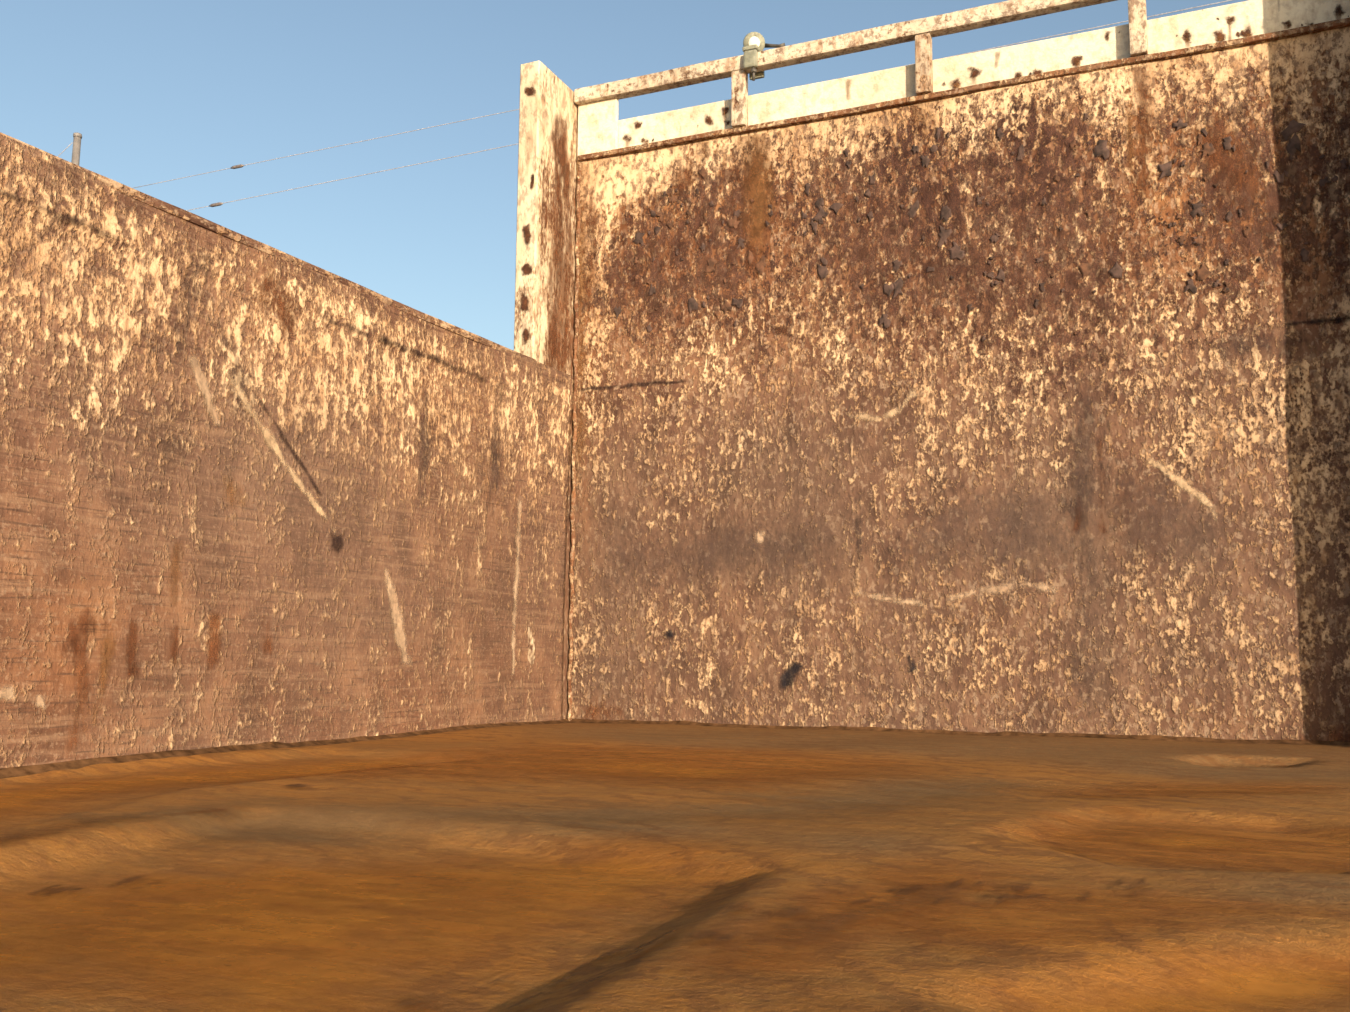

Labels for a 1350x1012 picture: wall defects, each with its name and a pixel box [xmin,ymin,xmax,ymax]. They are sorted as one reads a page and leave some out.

corrosion [1214,16,1251,42]
corrosion [522,224,531,244]
corrosion [548,56,1350,406]
corrosion [70,611,94,699]
corrosion [128,623,136,676]
corrosion [209,615,220,664]